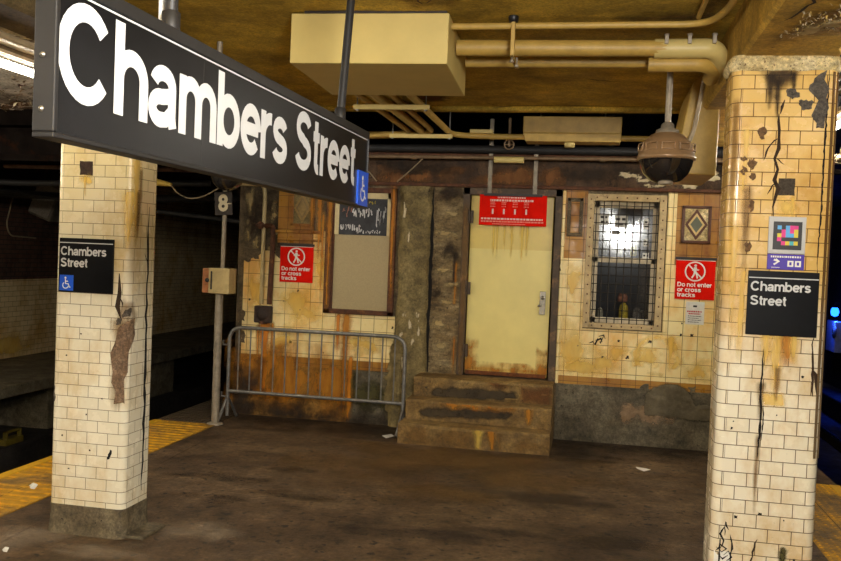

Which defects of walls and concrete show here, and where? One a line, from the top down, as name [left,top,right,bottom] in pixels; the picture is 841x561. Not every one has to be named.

crack [784,0,817,21]
peeling [780,3,841,40]
damp [767,70,797,112]
spalling [786,70,830,128]
peeling [619,172,665,188]
spalling [740,156,757,180]
crack [764,100,785,216]
peeling [778,178,795,196]
spalling [110,308,135,404]
rust [239,314,353,418]
rust [764,335,796,396]